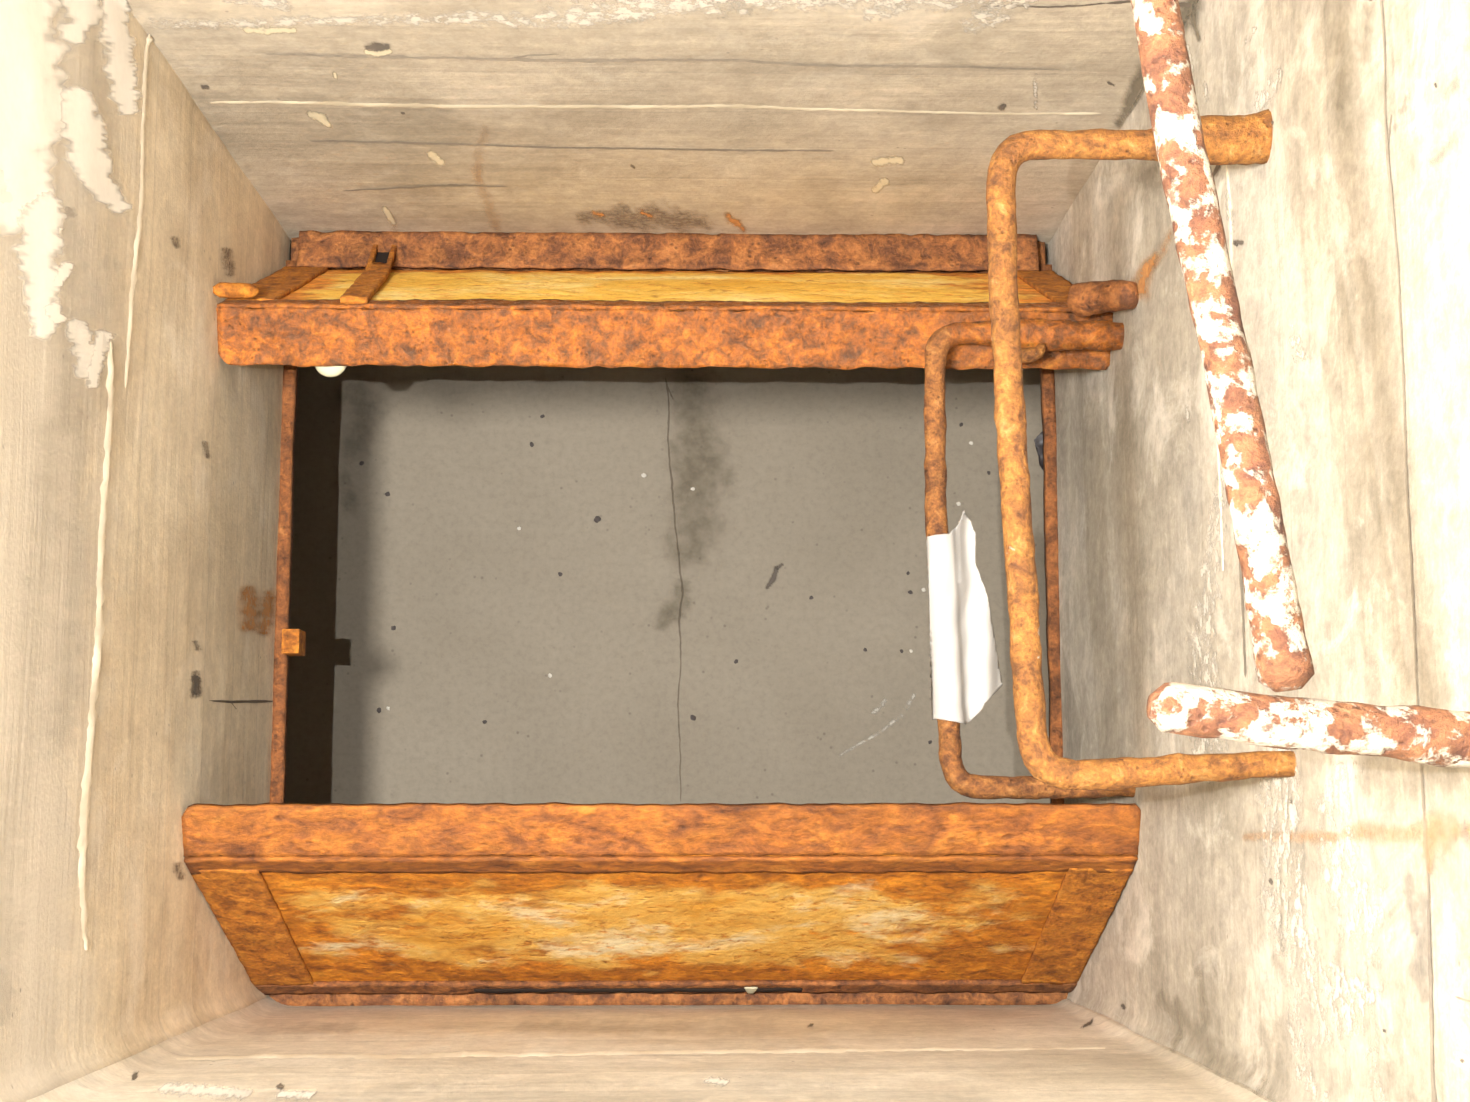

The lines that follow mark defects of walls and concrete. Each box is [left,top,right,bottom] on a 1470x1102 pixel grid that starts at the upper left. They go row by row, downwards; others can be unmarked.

peeling [0,0,141,388]
rust [1136,233,1171,294]
spalling [192,676,200,694]
crack [665,378,684,801]